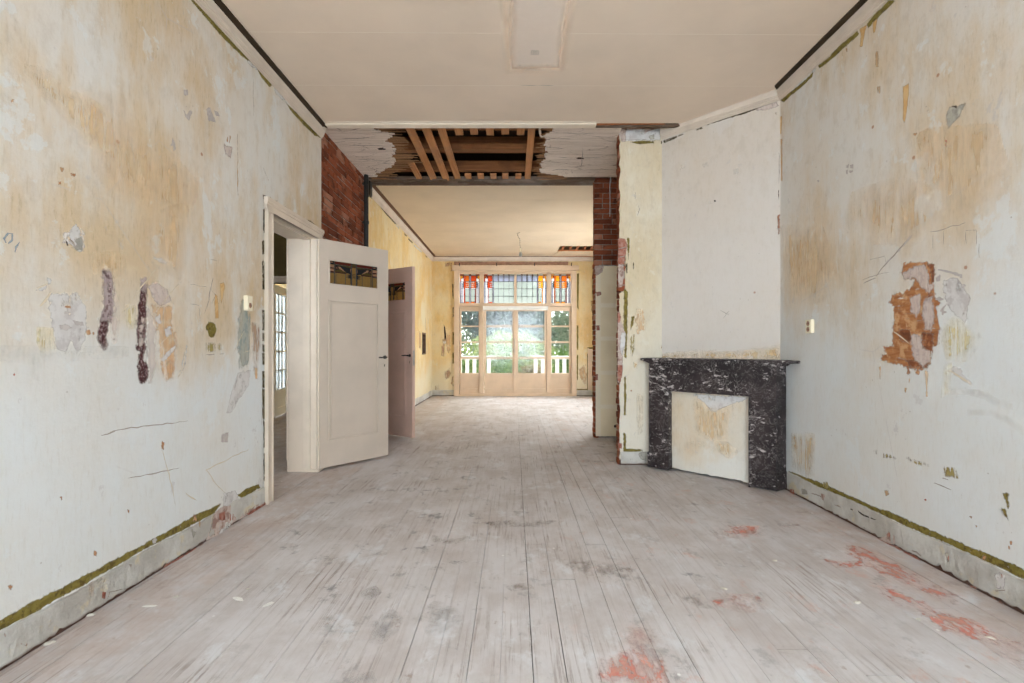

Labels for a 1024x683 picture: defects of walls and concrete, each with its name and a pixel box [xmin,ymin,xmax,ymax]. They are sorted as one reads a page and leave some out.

spalling [946,104,964,127]
peeling [63,224,85,251]
spalling [618,238,627,287]
peeling [37,278,87,352]
peeling [935,269,970,322]
crack [101,421,185,436]
crack [131,450,177,495]